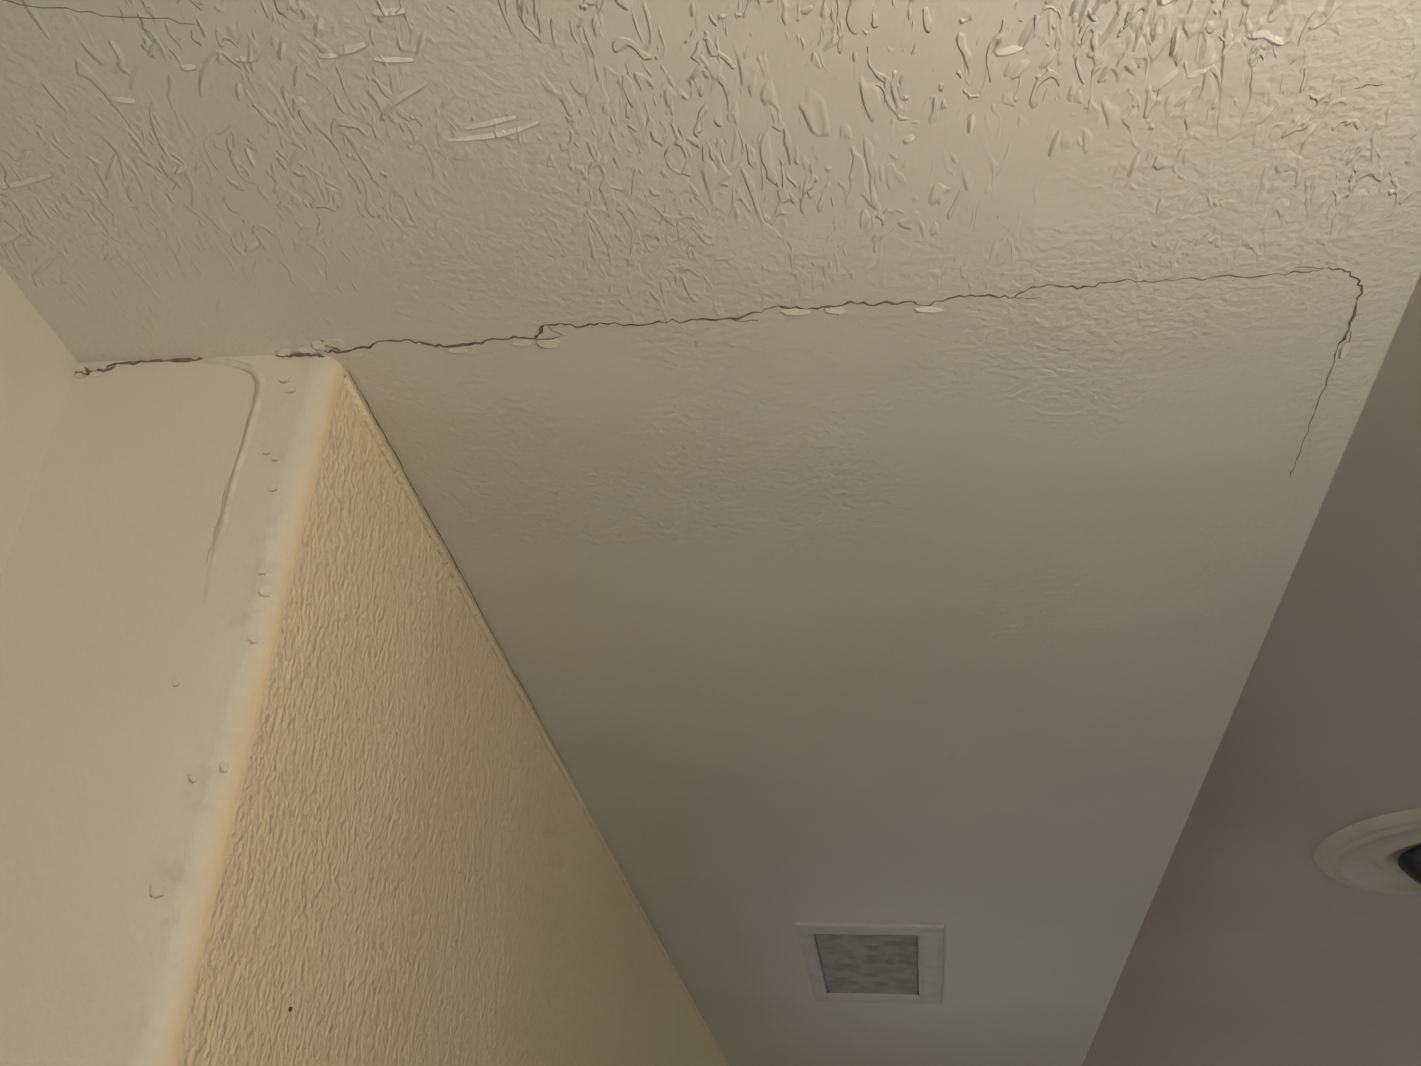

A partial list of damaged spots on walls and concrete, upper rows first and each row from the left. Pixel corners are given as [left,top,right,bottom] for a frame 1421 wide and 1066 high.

crack [75,357,203,378]
crack [276,266,1363,783]